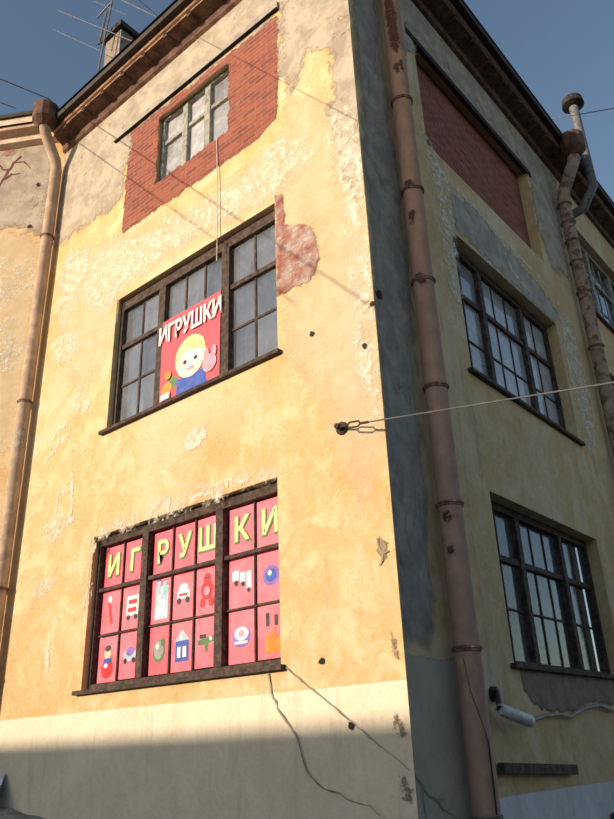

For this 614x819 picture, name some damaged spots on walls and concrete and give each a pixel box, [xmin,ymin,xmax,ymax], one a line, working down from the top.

corrosion [384,0,403,72]
crack [0,156,30,184]
flaking render [0,144,50,236]
flaking render [52,0,435,659]
peeling [44,472,75,542]
crack [267,666,461,819]
spalling [399,776,413,804]